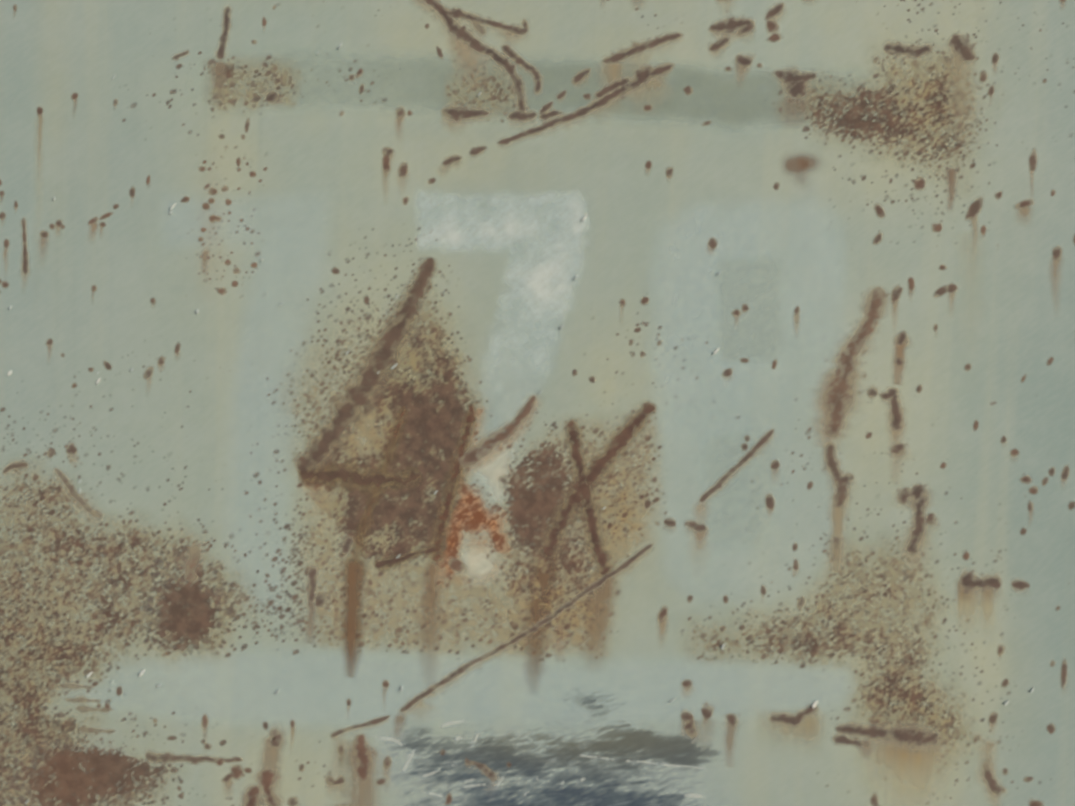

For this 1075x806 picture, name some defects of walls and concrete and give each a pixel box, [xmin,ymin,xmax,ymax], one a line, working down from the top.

rust [173,7,312,139]
rust [396,107,412,124]
rust [775,29,999,235]
rust [1016,200,1033,216]
rust [0,258,668,806]
rust [688,519,1030,779]
rust [681,702,713,739]